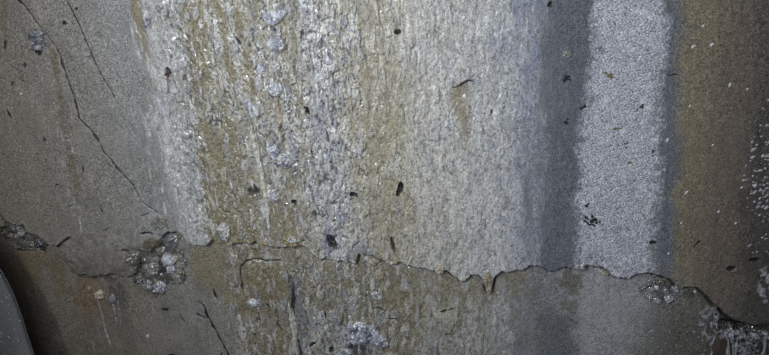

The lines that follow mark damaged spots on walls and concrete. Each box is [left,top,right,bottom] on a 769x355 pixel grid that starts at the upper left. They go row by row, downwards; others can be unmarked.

crack [18,0,182,281]
water stain [124,0,683,355]
water stain [676,0,769,355]
spalling [0,224,48,252]
spalling [123,232,190,297]
crack [179,290,229,355]
crack [212,239,302,355]
crack [447,271,504,296]
crack [650,273,745,324]